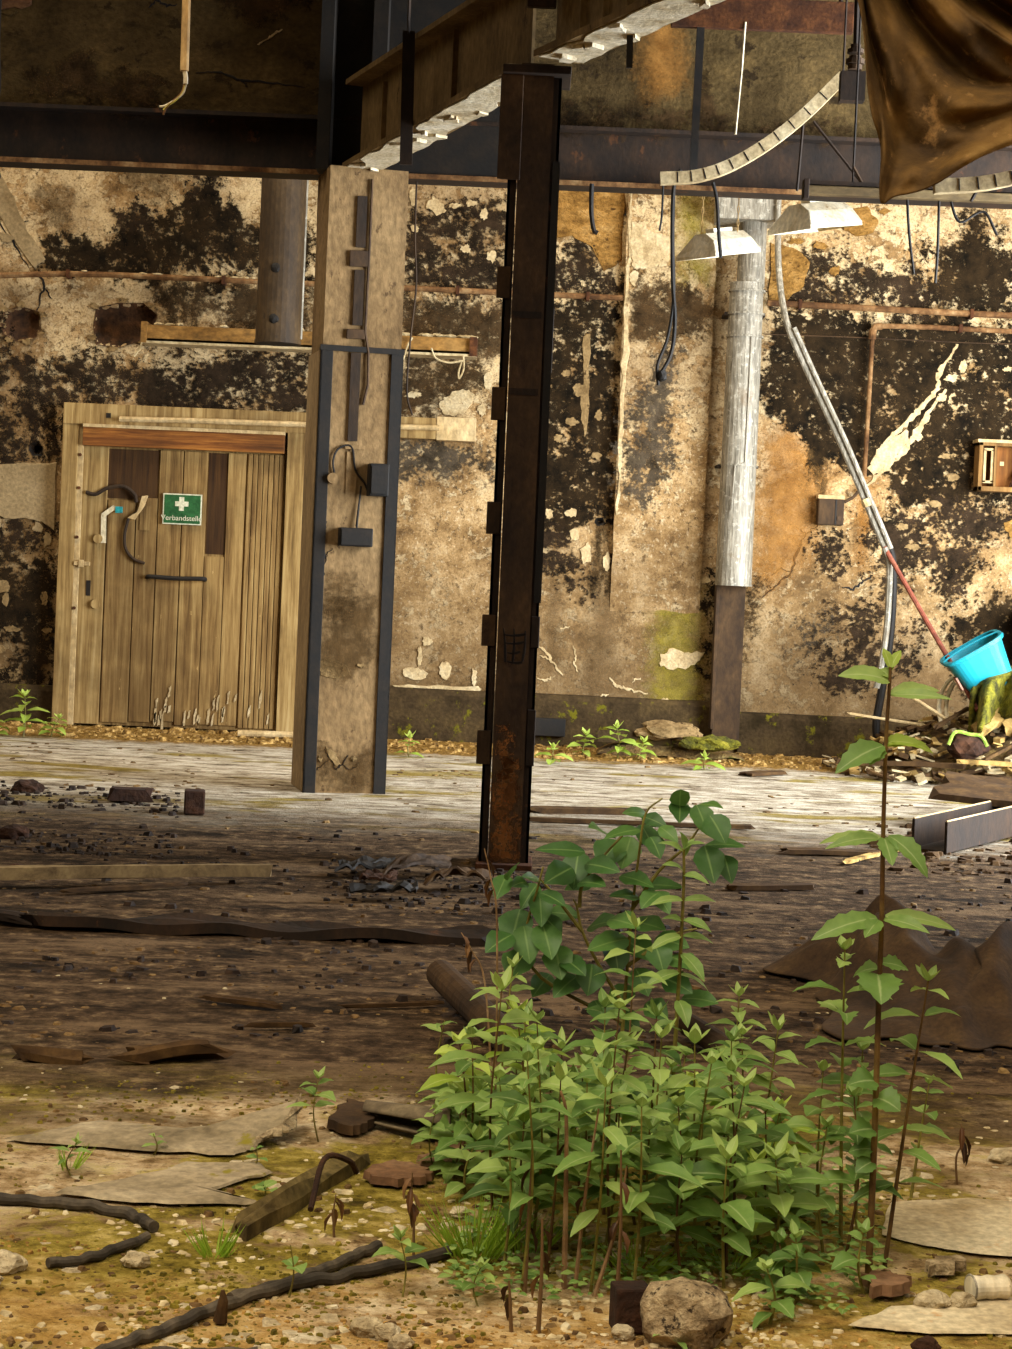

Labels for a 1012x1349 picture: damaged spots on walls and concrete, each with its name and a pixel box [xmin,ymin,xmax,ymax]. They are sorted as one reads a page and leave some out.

peeling [0,301,46,345]
water stain [34,172,260,300]
water stain [0,300,311,467]
water stain [304,219,316,290]
water stain [404,187,515,311]
water stain [542,237,690,681]
water stain [759,207,1012,706]
peeling [867,344,967,486]
water stain [0,512,60,685]
water stain [742,576,772,667]
peeling [896,523,921,551]
rust [489,725,521,864]